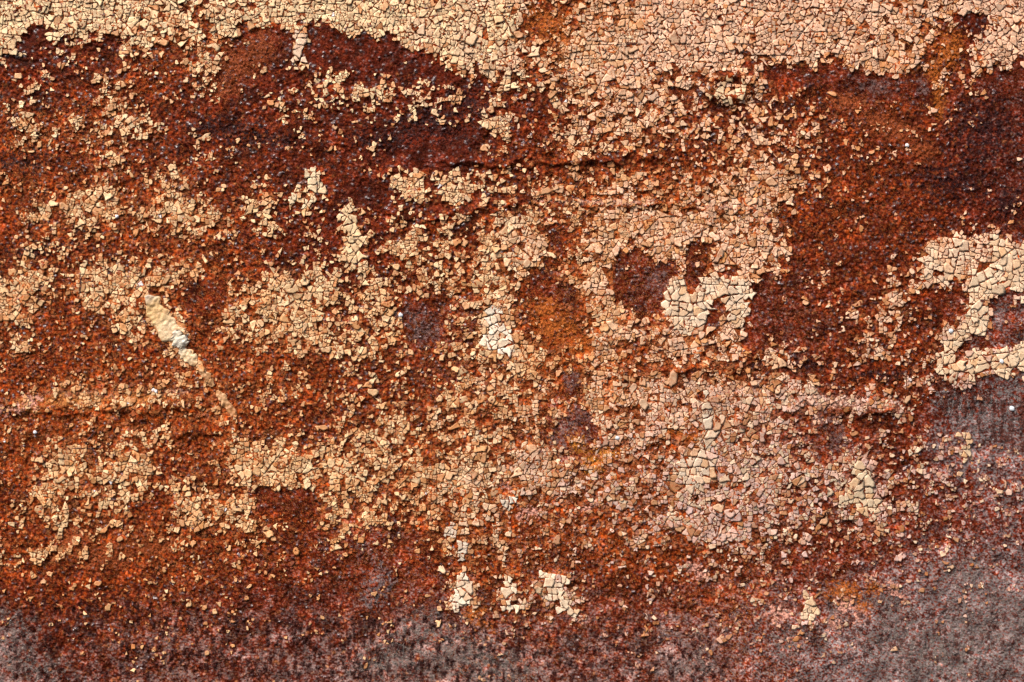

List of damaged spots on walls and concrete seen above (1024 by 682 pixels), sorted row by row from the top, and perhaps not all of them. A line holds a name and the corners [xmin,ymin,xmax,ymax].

rust [133,9,286,101]
peeling [262,66,466,127]
crack [574,43,662,62]
peeling [829,103,922,175]
peeling [0,63,238,358]
peeling [247,360,316,420]
rust [0,62,827,682]
rust [886,271,1024,454]
rust [687,377,879,590]
peeling [57,578,122,629]
peeling [162,564,252,633]
rust [824,580,1021,680]